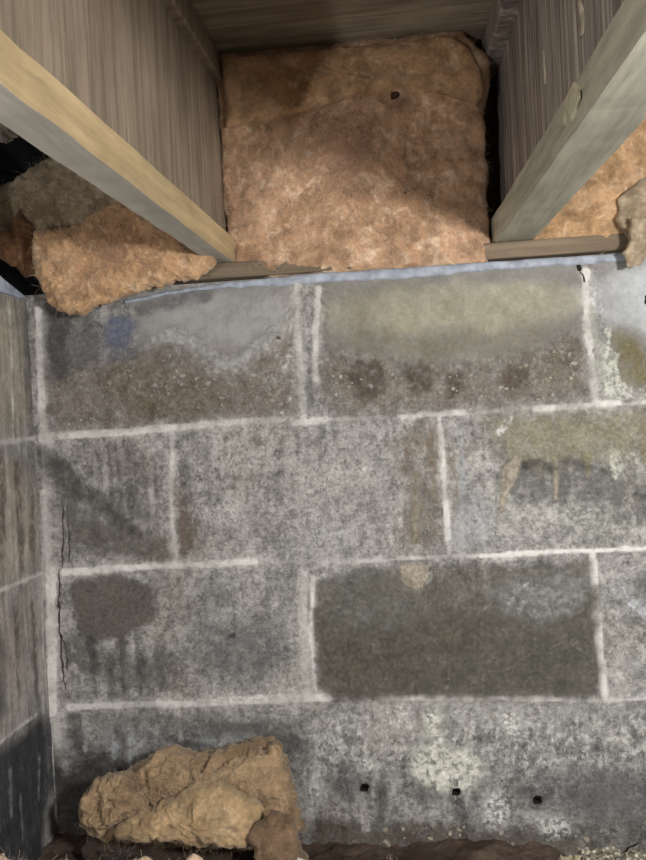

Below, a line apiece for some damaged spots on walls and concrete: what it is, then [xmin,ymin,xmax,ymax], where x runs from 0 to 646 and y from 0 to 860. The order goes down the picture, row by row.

leakage [45,302,133,376]
leakage [140,305,303,369]
leakage [600,327,646,399]
leakage [495,416,646,517]
leakage [66,577,178,685]
leakage [305,562,646,812]
leakage [482,787,510,829]
leakage [532,814,570,838]